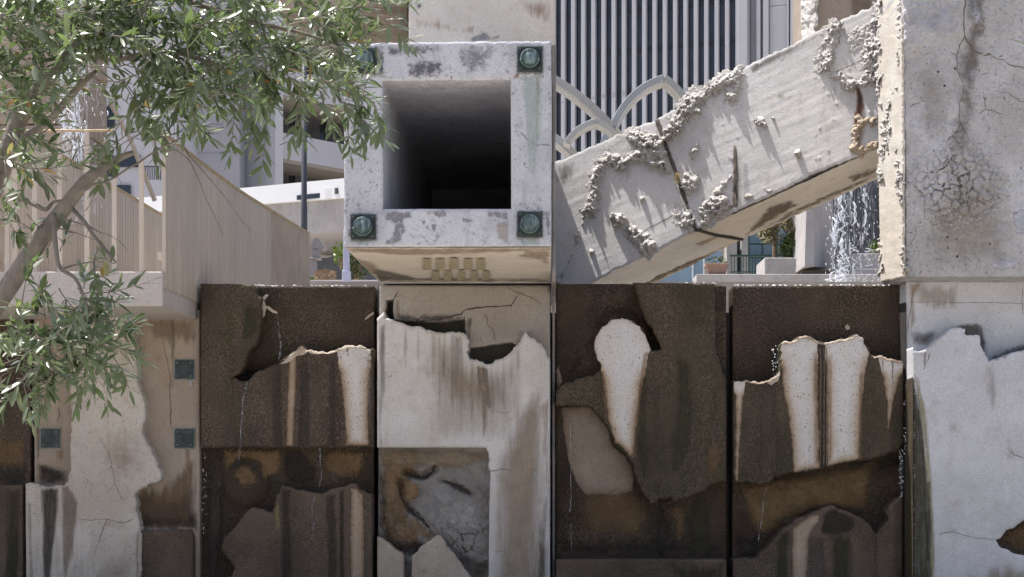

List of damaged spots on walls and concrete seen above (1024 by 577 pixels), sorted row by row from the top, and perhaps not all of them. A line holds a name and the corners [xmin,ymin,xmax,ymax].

rust [854,87,864,125]
crack [910,0,1024,246]
crack [731,147,739,207]
spalling [281,345,366,364]
spalling [365,285,550,359]
crack [415,286,539,344]
spalling [958,324,985,350]
damp [451,367,493,424]
spalling [378,448,490,577]
damp [381,451,488,554]
crack [401,467,537,555]
damp [504,406,544,577]